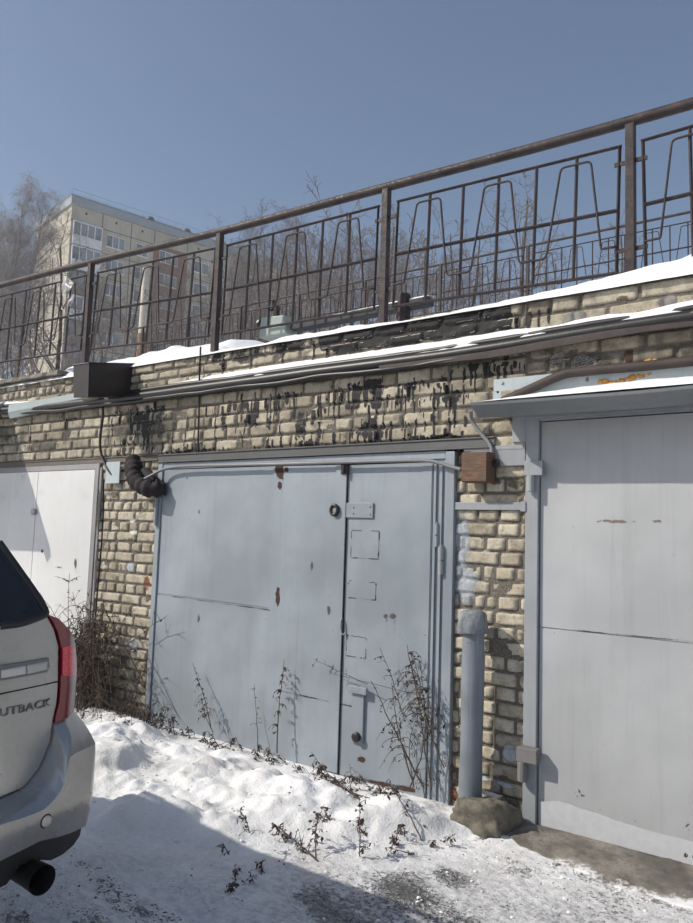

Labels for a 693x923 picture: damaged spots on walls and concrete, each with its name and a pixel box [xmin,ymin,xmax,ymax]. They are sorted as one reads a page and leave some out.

water stain [211,305,551,374]
water stain [110,356,525,467]
rust [275,466,289,490]